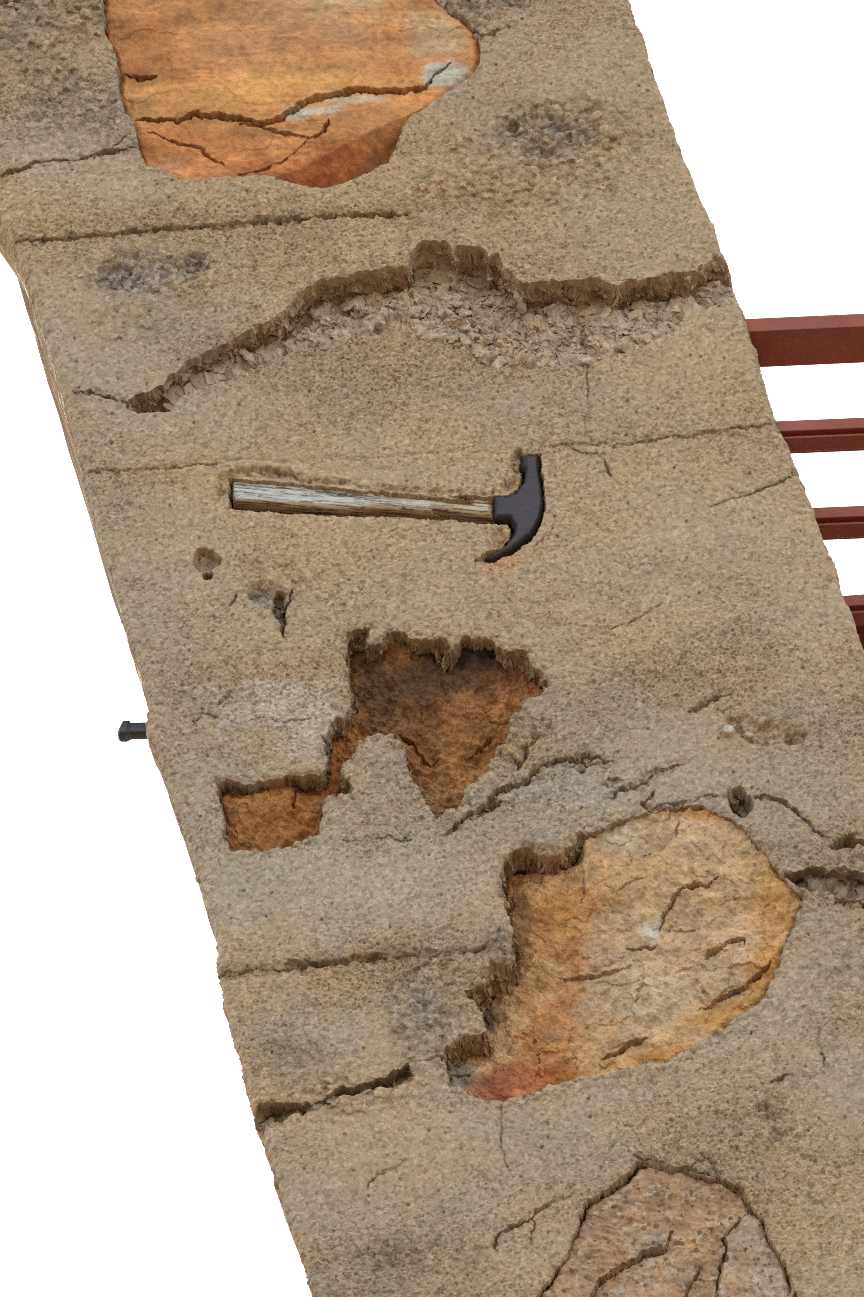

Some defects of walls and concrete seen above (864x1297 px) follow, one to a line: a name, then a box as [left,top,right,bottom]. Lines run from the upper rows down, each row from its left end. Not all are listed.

spalling [121,237,739,417]